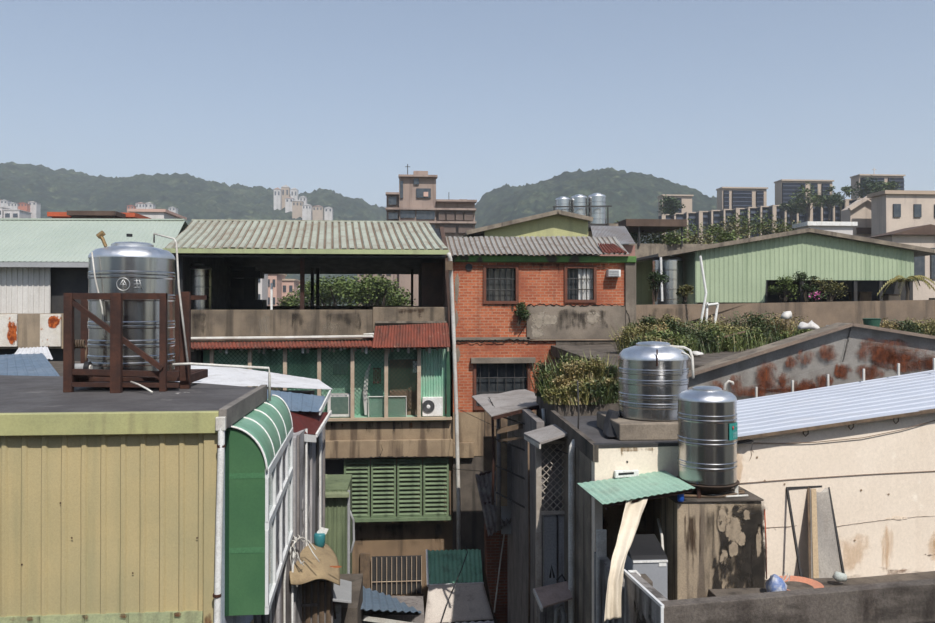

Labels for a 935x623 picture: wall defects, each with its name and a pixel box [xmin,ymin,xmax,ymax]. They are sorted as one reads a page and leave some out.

corrosion [7,322,17,344]
corrosion [48,316,60,328]
corrosion [713,339,935,397]
peeling [717,508,761,564]